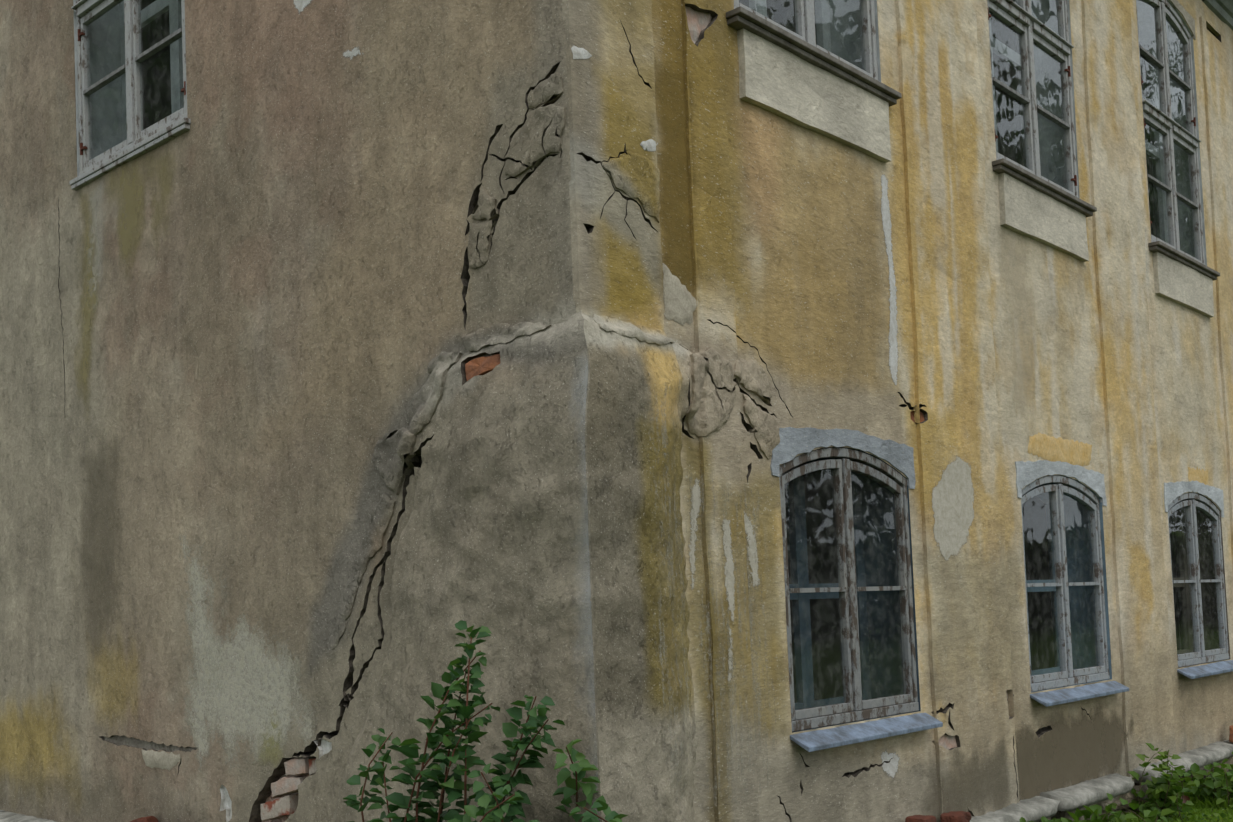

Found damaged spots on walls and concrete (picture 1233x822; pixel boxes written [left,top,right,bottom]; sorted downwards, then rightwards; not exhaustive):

flaking render [294,0,311,14]
spalling [685,4,718,47]
crack [461,62,658,327]
flaking render [371,322,551,495]
crack [682,319,792,482]
crack [292,435,434,759]
spalling [100,735,197,771]
spalling [249,739,332,822]